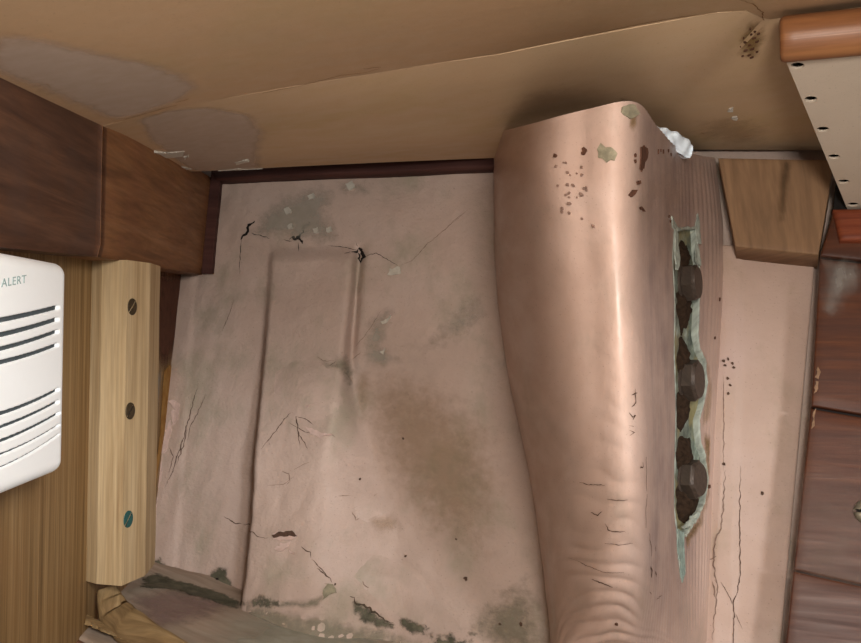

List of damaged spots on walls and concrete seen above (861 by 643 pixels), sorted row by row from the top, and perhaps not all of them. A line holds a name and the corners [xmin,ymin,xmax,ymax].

peeling [154,150,192,170]
crack [239,221,310,269]
corrosion [679,240,691,267]
corrosion [676,292,693,372]
peeling [671,213,709,543]
crack [167,390,205,483]
corrosion [676,391,694,469]
corrosion [676,486,699,542]
crack [710,377,741,643]
leakage [142,560,239,623]
leakage [238,596,424,643]